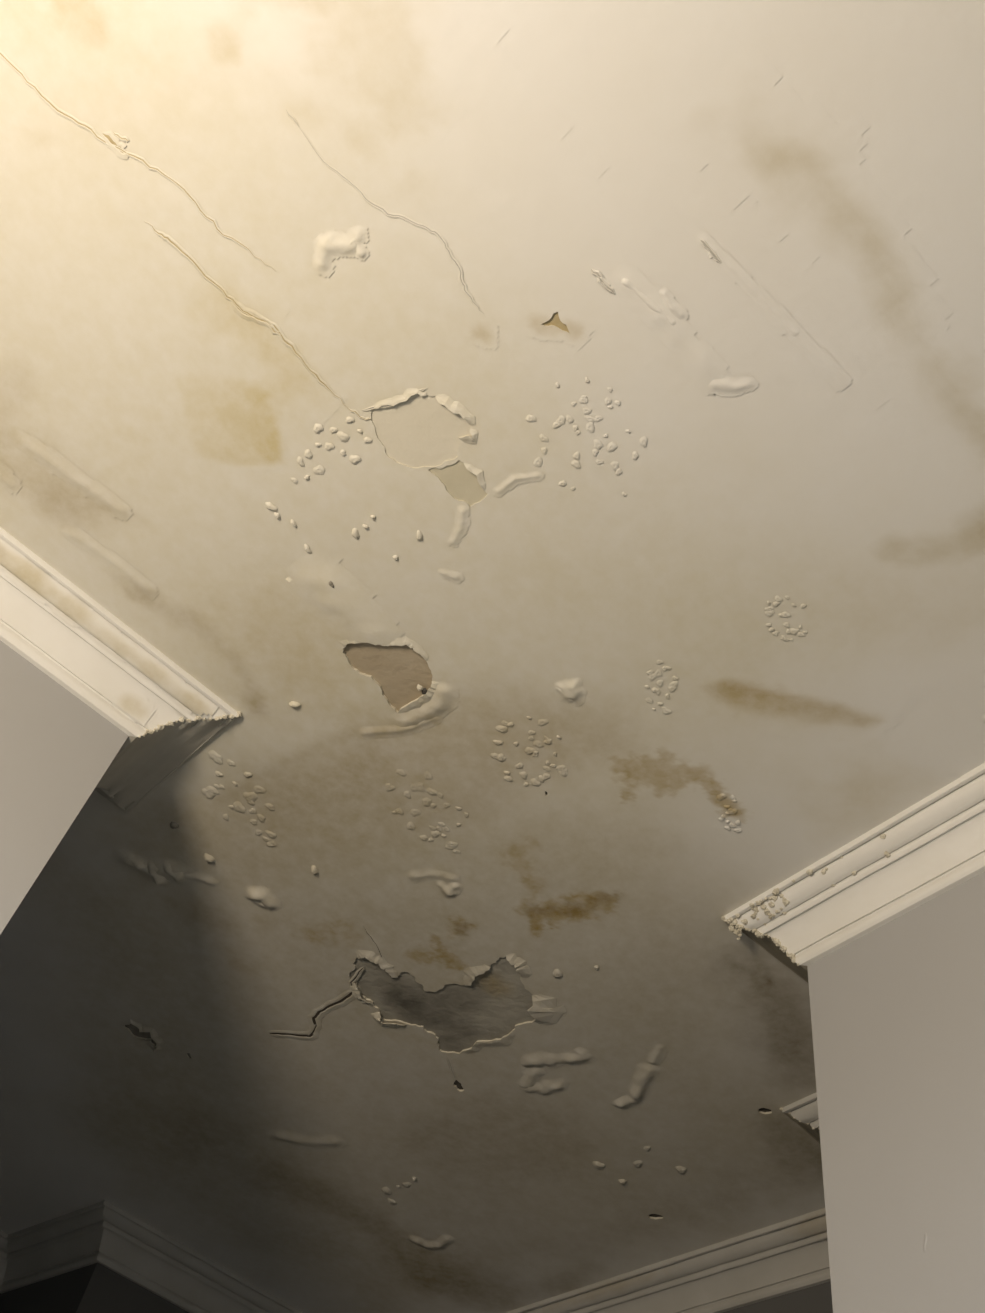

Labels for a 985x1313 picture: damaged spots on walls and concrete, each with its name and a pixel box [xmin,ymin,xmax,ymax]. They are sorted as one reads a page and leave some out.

crack [0,50,276,272]
crack [286,110,484,314]
crack [144,221,428,421]
spalling [520,307,594,350]
leakage [0,0,985,904]
spalling [338,636,461,740]
crack [269,926,389,1041]
leakage [0,785,828,1313]
spalling [348,949,597,1097]